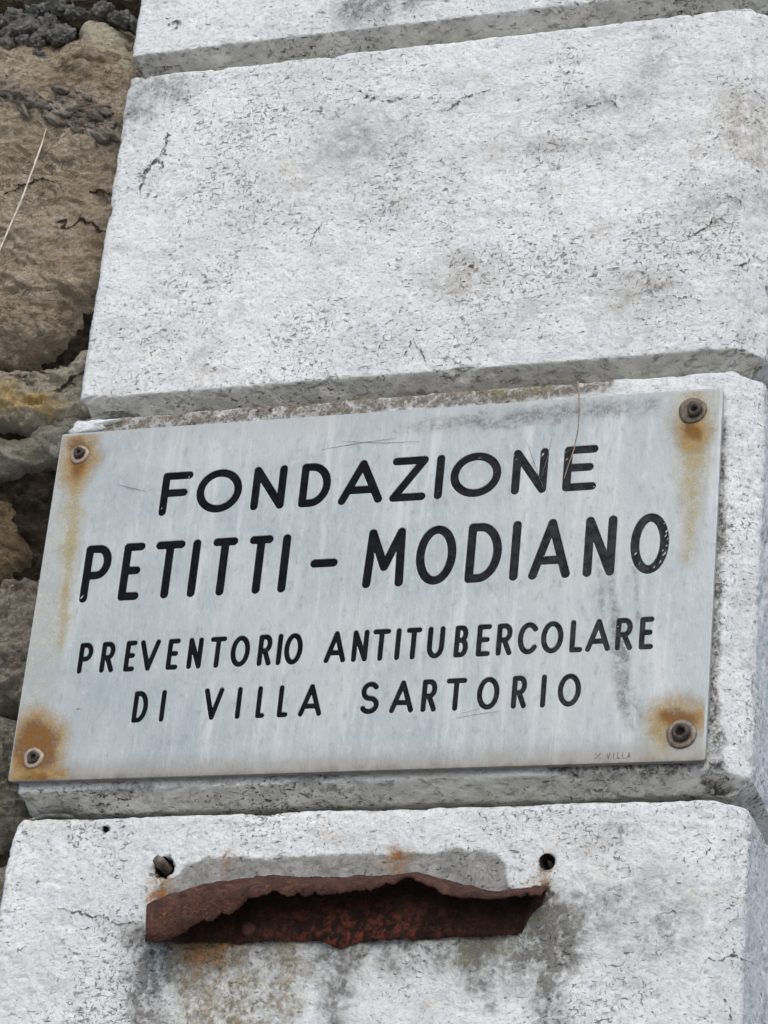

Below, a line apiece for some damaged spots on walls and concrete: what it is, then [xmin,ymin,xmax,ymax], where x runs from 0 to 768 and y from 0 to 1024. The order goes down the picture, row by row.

corrosion [57,434,100,644]
corrosion [678,392,710,560]
corrosion [10,711,68,780]
corrosion [647,700,705,747]